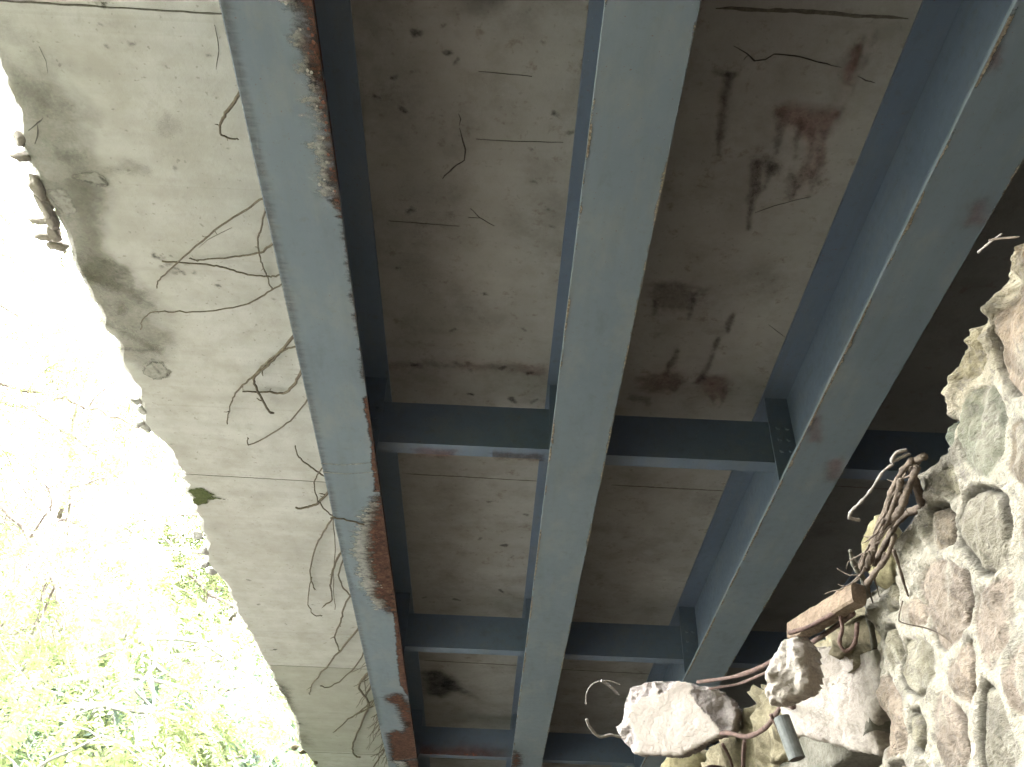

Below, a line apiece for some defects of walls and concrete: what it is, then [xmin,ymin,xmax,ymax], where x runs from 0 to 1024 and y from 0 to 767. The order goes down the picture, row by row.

spalling [5,130,77,252]
corrosion [291,0,358,331]
crack [734,46,875,83]
corrosion [362,396,492,767]